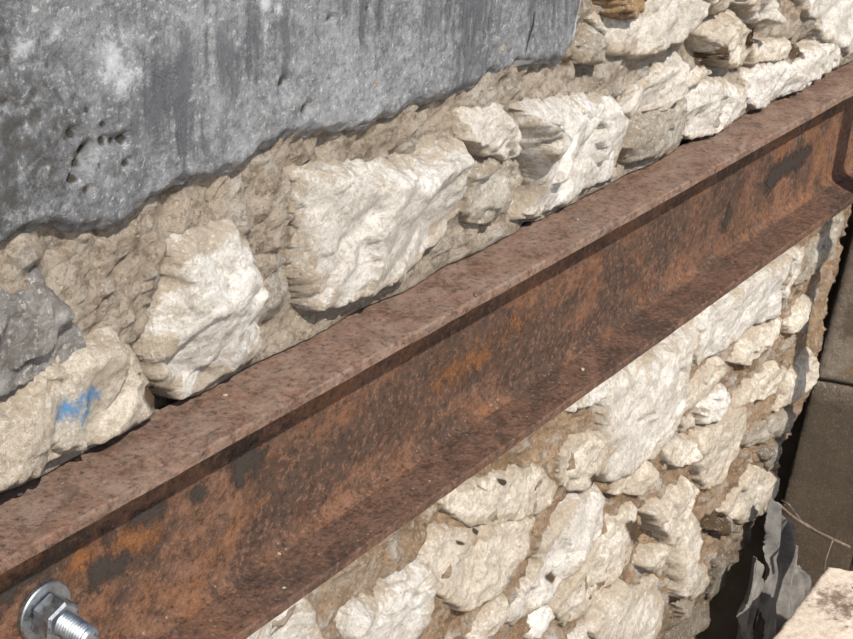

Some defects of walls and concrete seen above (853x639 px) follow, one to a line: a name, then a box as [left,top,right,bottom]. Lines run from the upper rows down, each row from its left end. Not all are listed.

corrosion [70,548,93,572]